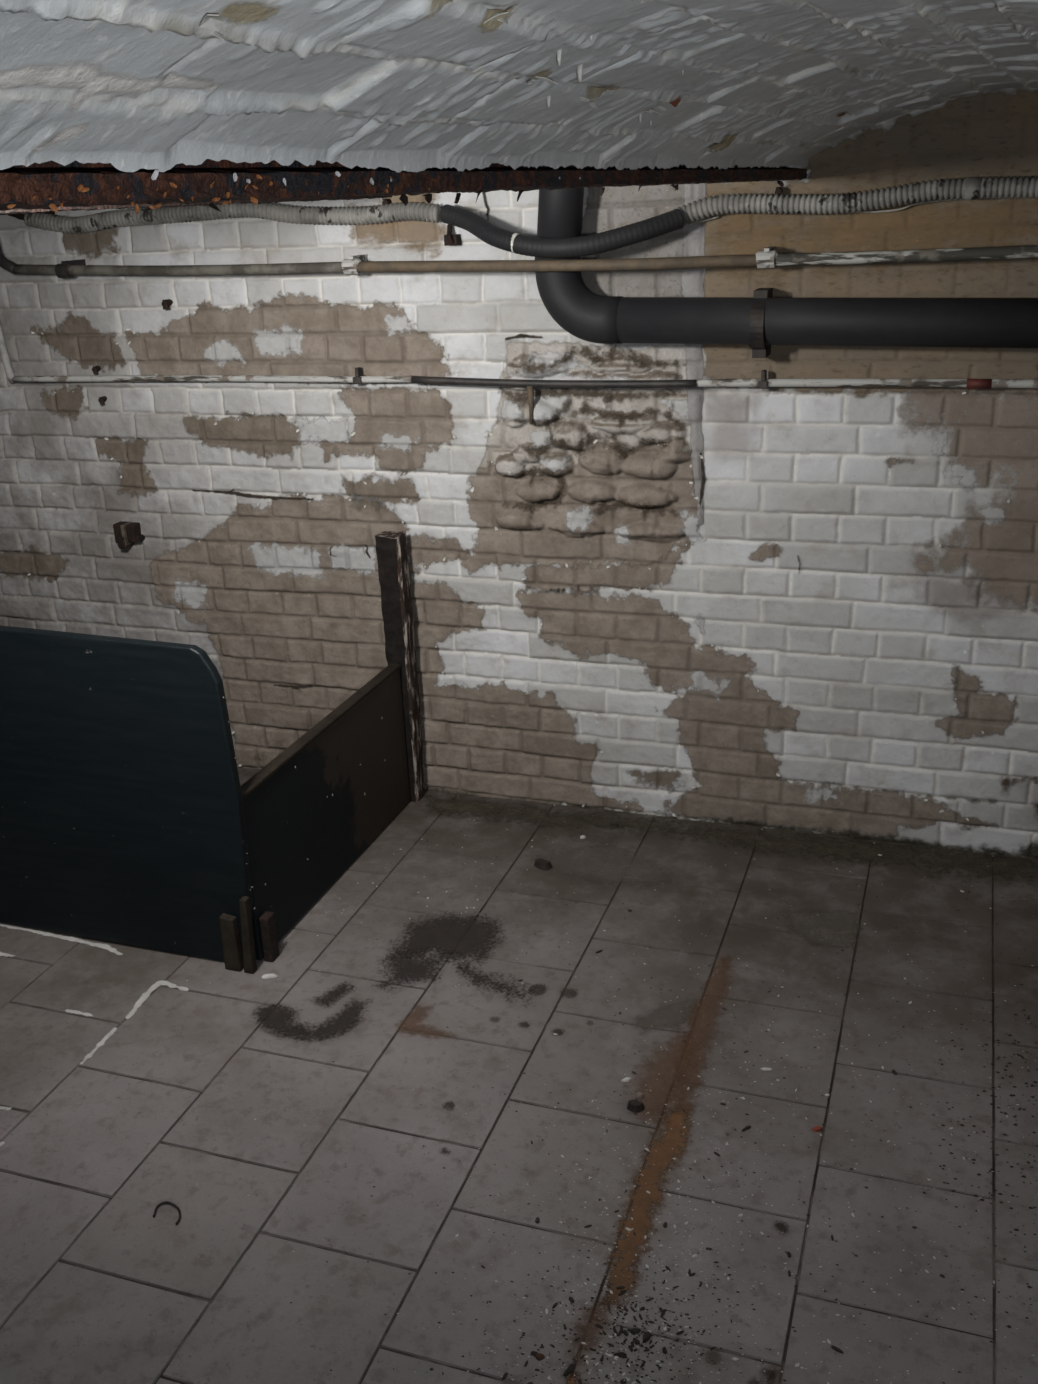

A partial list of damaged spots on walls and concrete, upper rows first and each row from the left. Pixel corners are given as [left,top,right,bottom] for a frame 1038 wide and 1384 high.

corrosion [117,175,273,213]
corrosion [385,176,432,206]
peeling [30,293,998,838]
peeling [935,666,1019,739]
corrosion [575,958,729,1361]